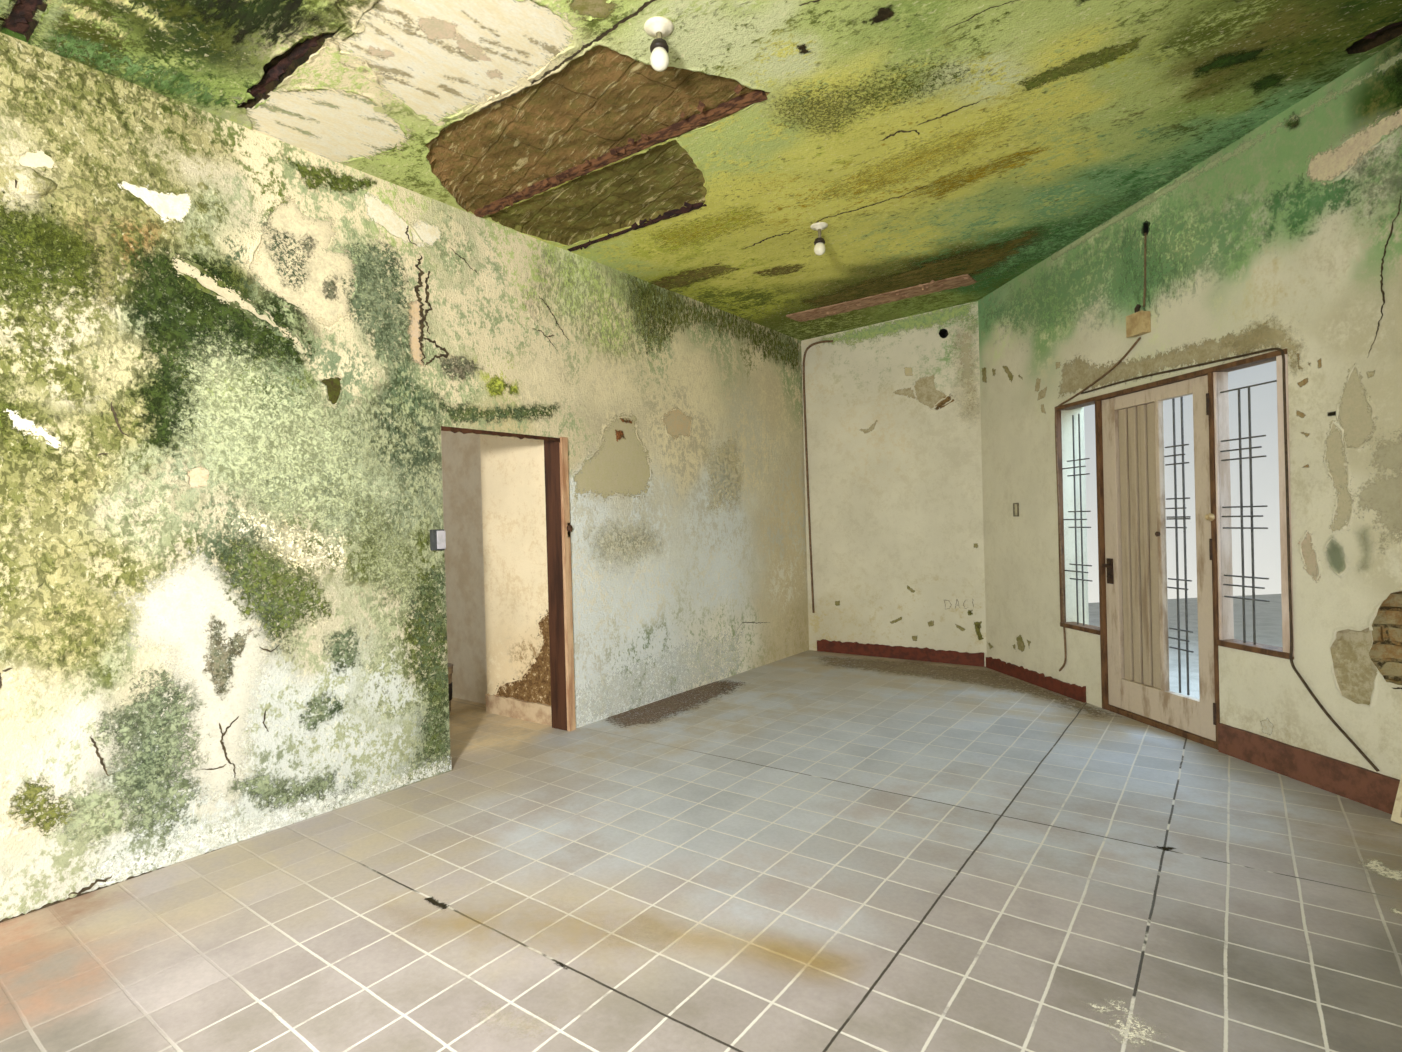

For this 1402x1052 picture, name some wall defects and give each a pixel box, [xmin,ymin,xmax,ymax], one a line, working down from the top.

damp [31,0,229,108]
damp [280,153,377,196]
crack [405,225,478,366]
peeling [226,0,771,217]
damp [1017,35,1146,91]
damp [800,48,1402,409]
flaking render [1301,104,1402,185]
crack [1367,196,1401,358]
damp [0,191,452,887]
flaking render [571,413,653,502]
flaking render [1297,363,1402,583]
spalling [1329,586,1402,709]